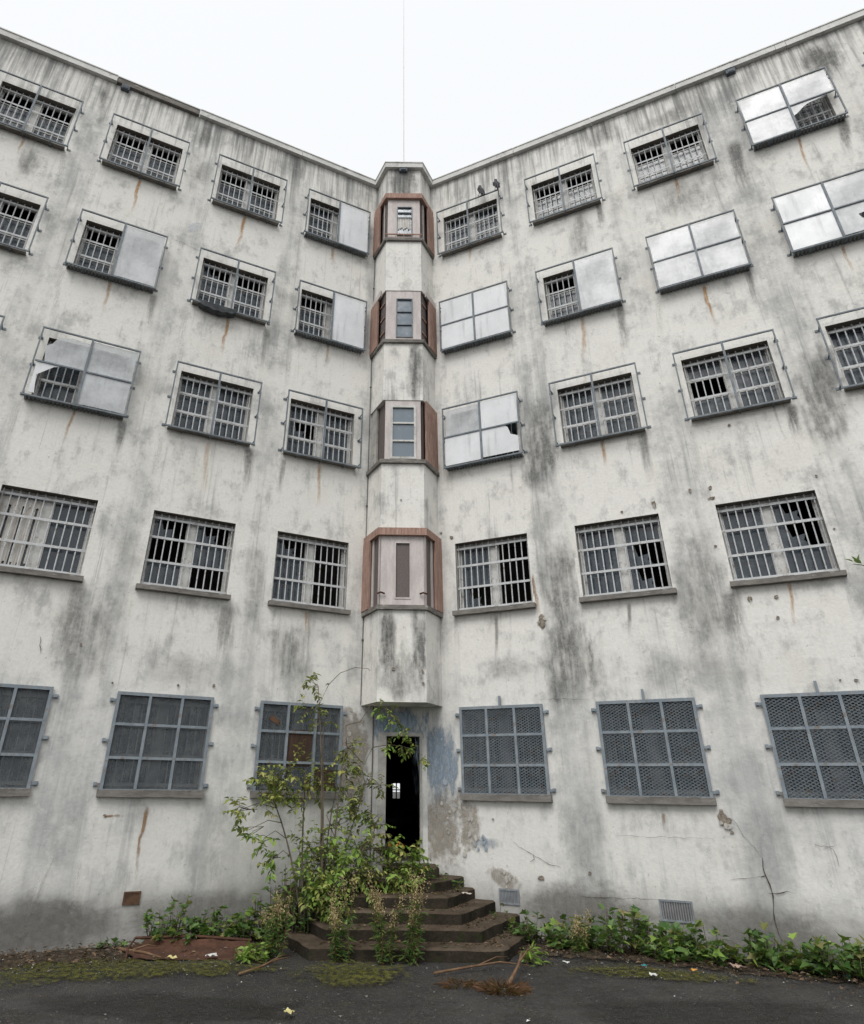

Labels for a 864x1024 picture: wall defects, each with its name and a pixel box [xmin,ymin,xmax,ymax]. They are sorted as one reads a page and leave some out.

damp [528,417,553,481]
damp [382,614,395,663]
damp [414,614,426,664]
damp [553,634,593,701]
spalling [717,809,734,834]
crack [733,820,792,940]